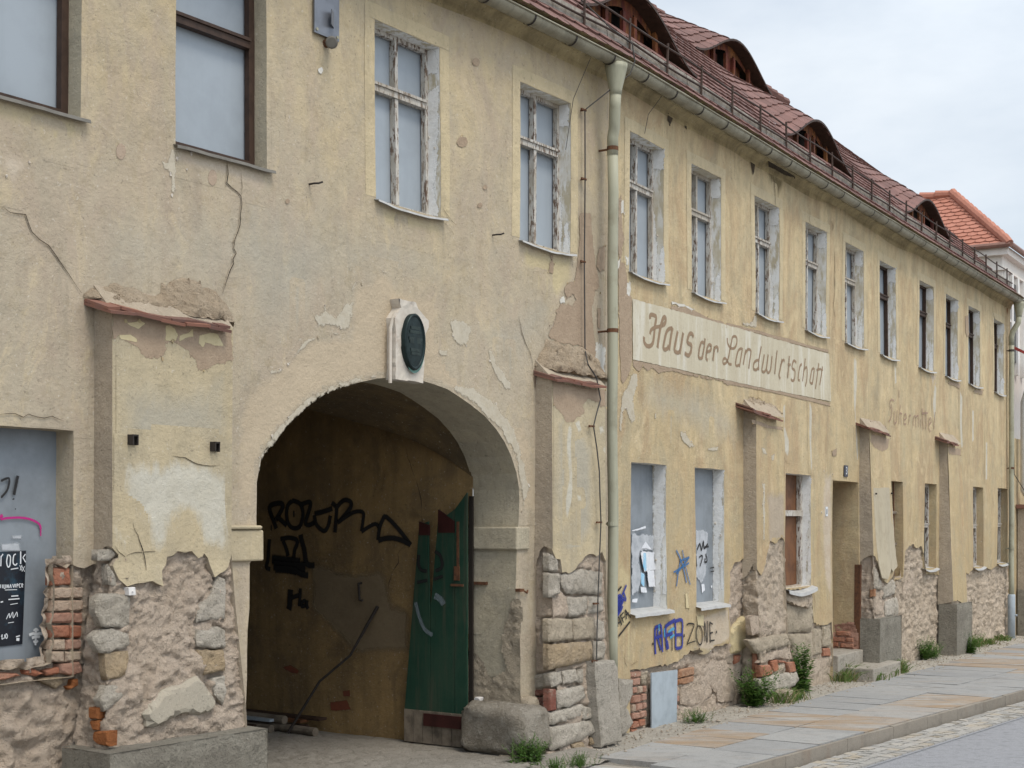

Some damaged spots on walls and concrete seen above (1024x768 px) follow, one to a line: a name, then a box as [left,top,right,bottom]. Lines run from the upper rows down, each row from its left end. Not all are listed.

crack [0,206,81,292]
peeling [111,313,234,372]
crack [222,162,243,293]
peeling [232,255,535,525]
peeling [653,148,665,189]
peeling [544,189,831,431]
peeling [711,178,721,199]
spalling [0,546,245,768]
crack [115,524,155,567]
spalling [468,546,608,754]
spalling [630,449,1009,732]